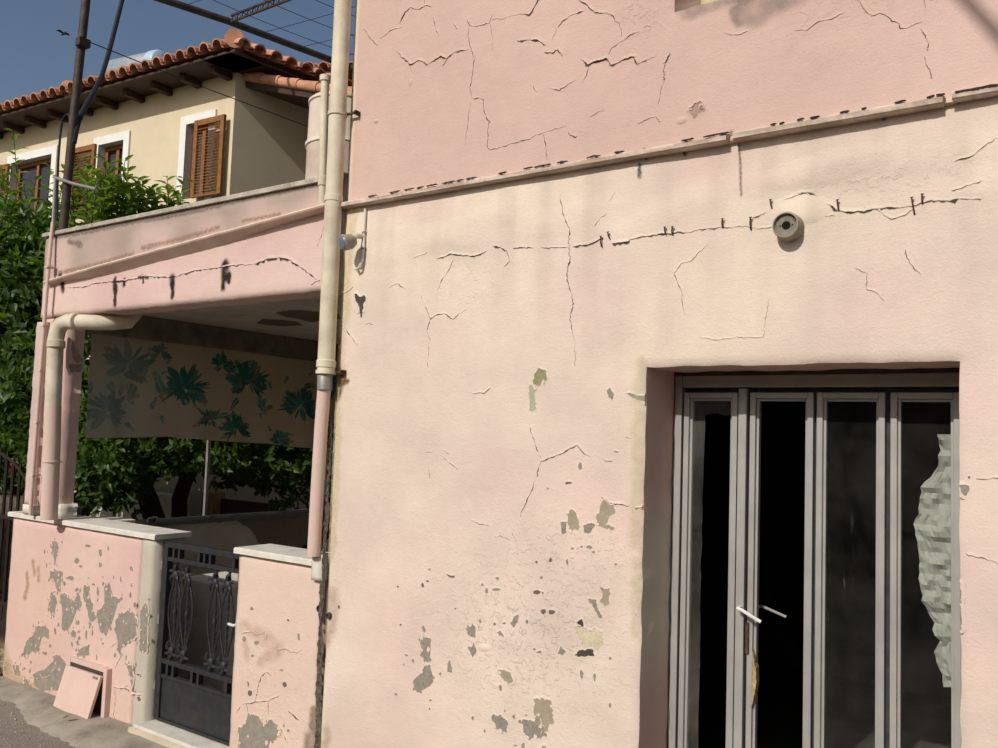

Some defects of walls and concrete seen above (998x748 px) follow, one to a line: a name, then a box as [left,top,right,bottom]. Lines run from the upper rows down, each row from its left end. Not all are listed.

crack [363,0,671,160]
crack [794,0,934,79]
leakage [113,277,126,306]
crack [67,226,354,302]
leakage [221,260,231,290]
crack [388,136,998,368]
crack [470,423,632,542]
spalling [532,496,617,596]
peeling [4,538,150,702]
peeling [402,623,454,711]
peeling [237,712,291,748]
spalling [484,695,556,748]